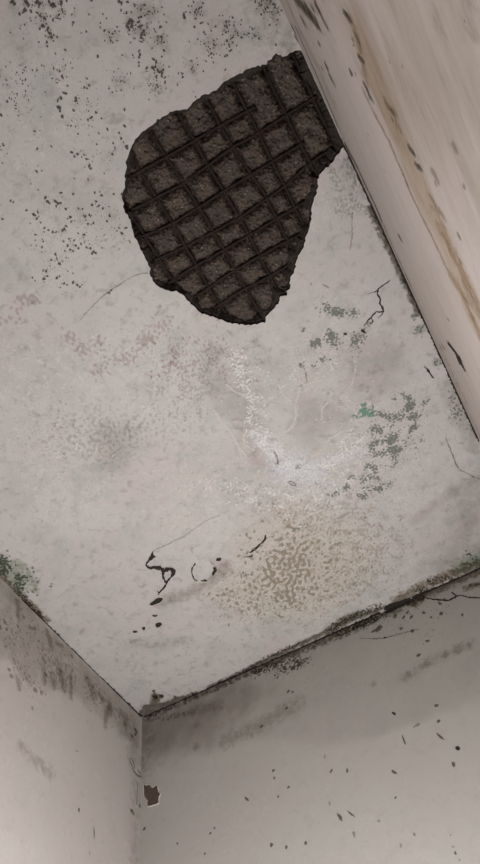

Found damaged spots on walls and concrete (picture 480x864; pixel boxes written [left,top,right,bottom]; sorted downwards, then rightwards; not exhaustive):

spalling [122,50,343,325]
mould [369,206,417,312]
crack [341,139,479,442]
efflorescence [199,322,444,520]
crack [146,551,176,595]
mould [140,576,453,717]
peeling [143,784,161,807]